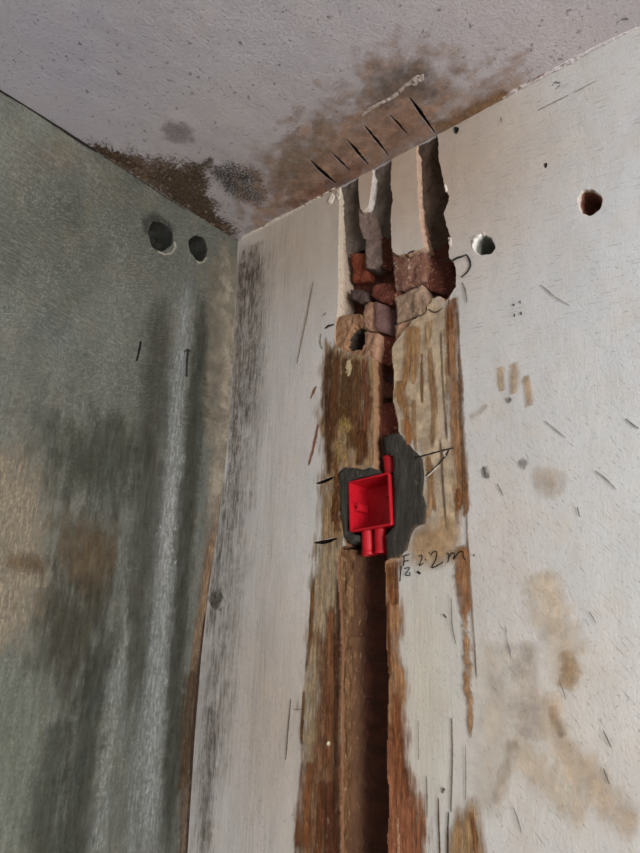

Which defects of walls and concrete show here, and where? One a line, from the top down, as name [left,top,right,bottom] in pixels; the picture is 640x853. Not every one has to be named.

mould [88,143,241,241]
leakage [253,60,519,228]
peeling [361,73,431,117]
spalling [334,208,456,368]
leakage [0,253,258,853]
corrosion [295,340,375,853]
corrosion [392,298,477,738]
corrosion [385,557,426,853]
corrosion [450,802,484,853]